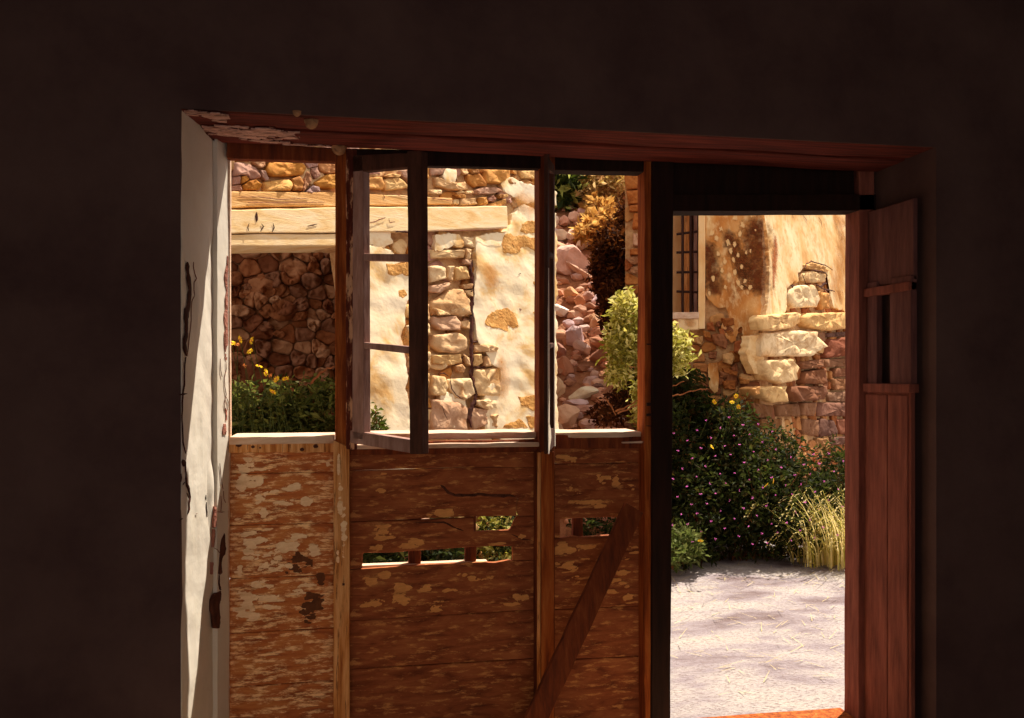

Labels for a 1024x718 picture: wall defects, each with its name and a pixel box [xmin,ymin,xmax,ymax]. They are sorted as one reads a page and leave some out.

peeling [184,109,330,147]
spalling [501,221,535,254]
flaking render [708,215,756,296]
spalling [485,308,519,331]
crack [439,260,485,428]
crack [179,262,226,521]
crack [440,485,515,498]
peeling [209,457,326,629]
peeling [369,524,425,551]
crack [415,521,463,531]
peeling [555,541,596,583]
peeling [360,571,458,612]